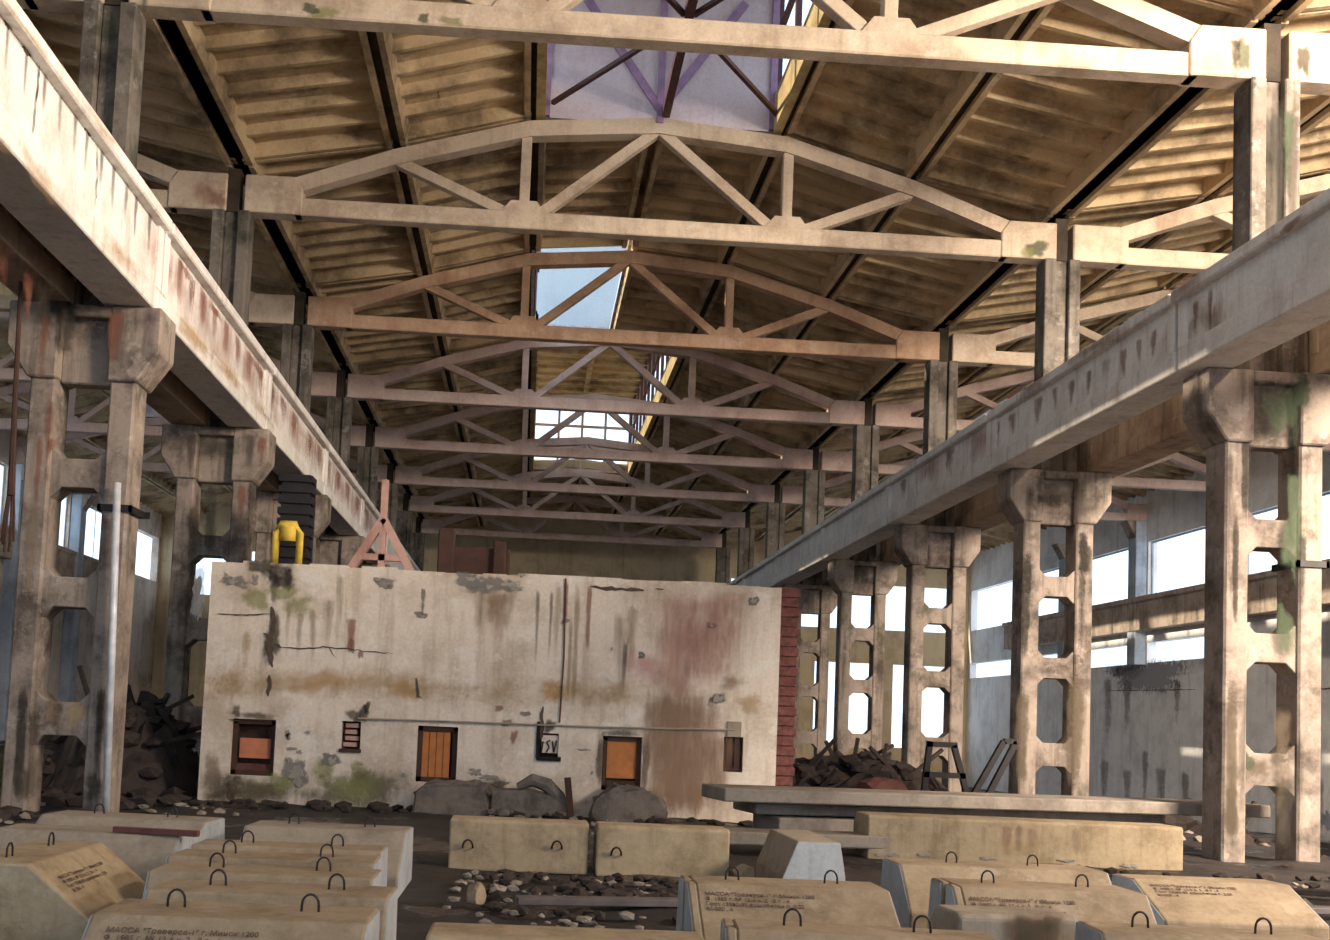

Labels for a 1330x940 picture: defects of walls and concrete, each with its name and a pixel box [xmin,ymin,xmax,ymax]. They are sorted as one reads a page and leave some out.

rust [179,261,297,424]
damp [1289,476,1306,600]
flaking render [457,571,526,593]
flaking render [282,730,311,788]
spalling [322,723,360,765]